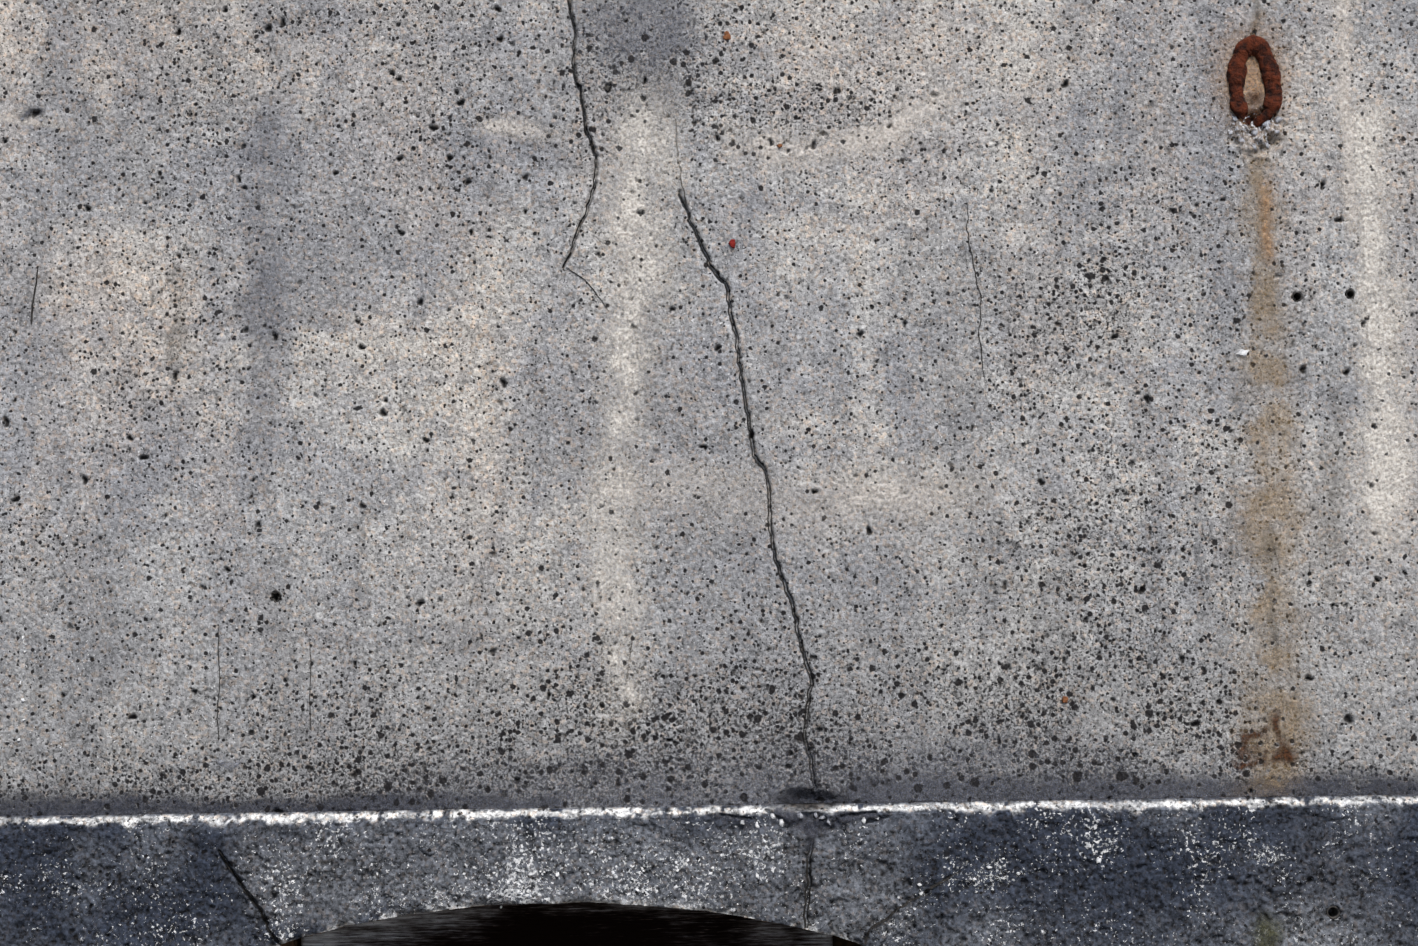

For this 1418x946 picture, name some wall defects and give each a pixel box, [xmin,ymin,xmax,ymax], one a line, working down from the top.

rust [1243,55,1265,121]
crack [562,0,609,311]
crack [674,117,817,789]
rust [1234,715,1294,770]
crack [803,844,814,928]